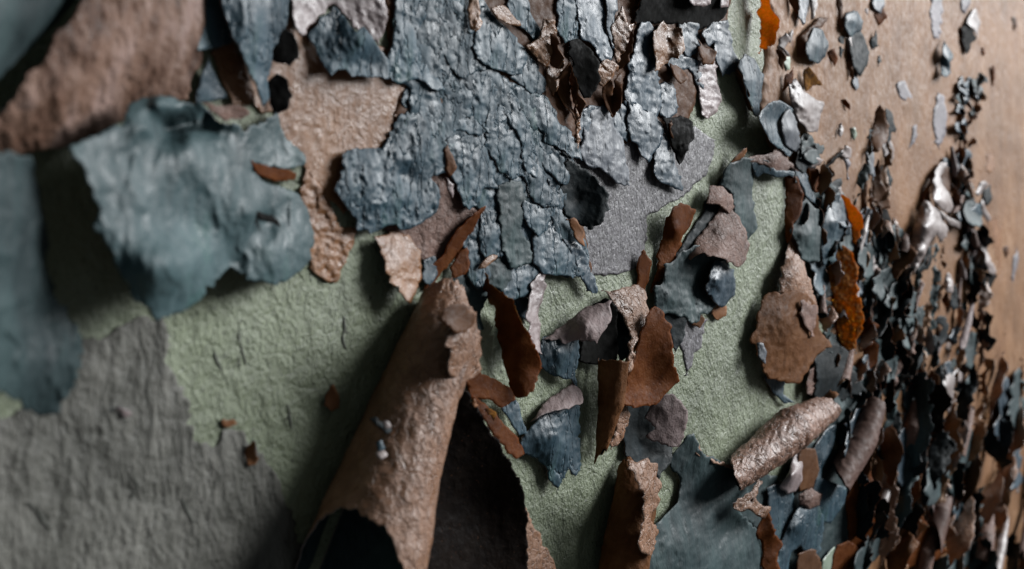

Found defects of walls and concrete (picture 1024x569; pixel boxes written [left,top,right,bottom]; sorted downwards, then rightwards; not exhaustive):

flaking render [0,0,407,569]
peeling [333,0,1024,569]
rust [827,194,864,351]